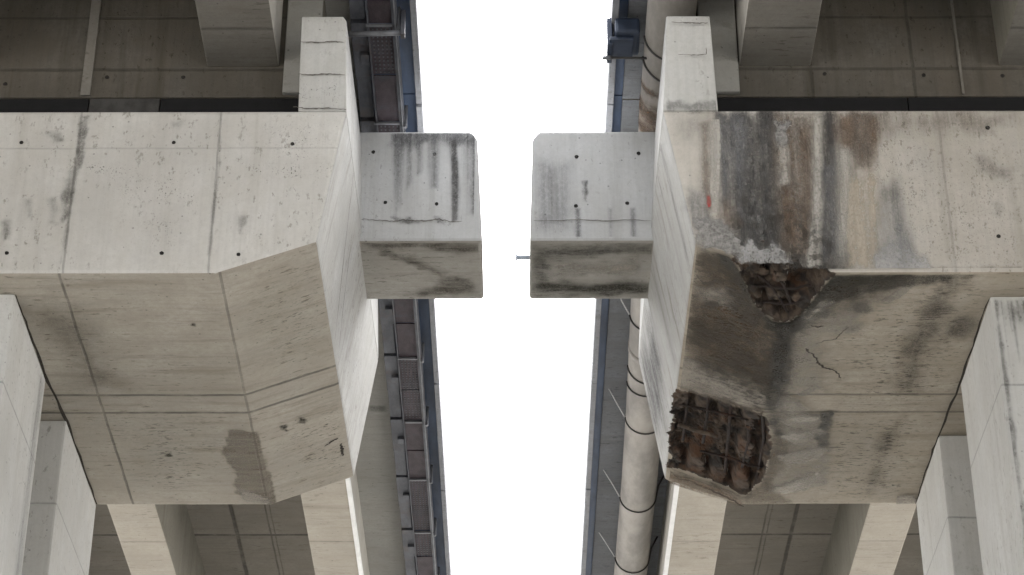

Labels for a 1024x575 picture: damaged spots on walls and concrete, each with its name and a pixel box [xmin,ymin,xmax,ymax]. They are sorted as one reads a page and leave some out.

water stain [394,133,475,220]
water stain [420,278,473,295]
water stain [427,243,478,252]
water stain [536,247,648,296]
water stain [669,111,952,505]
crack [806,325,846,378]
water stain [223,430,276,504]